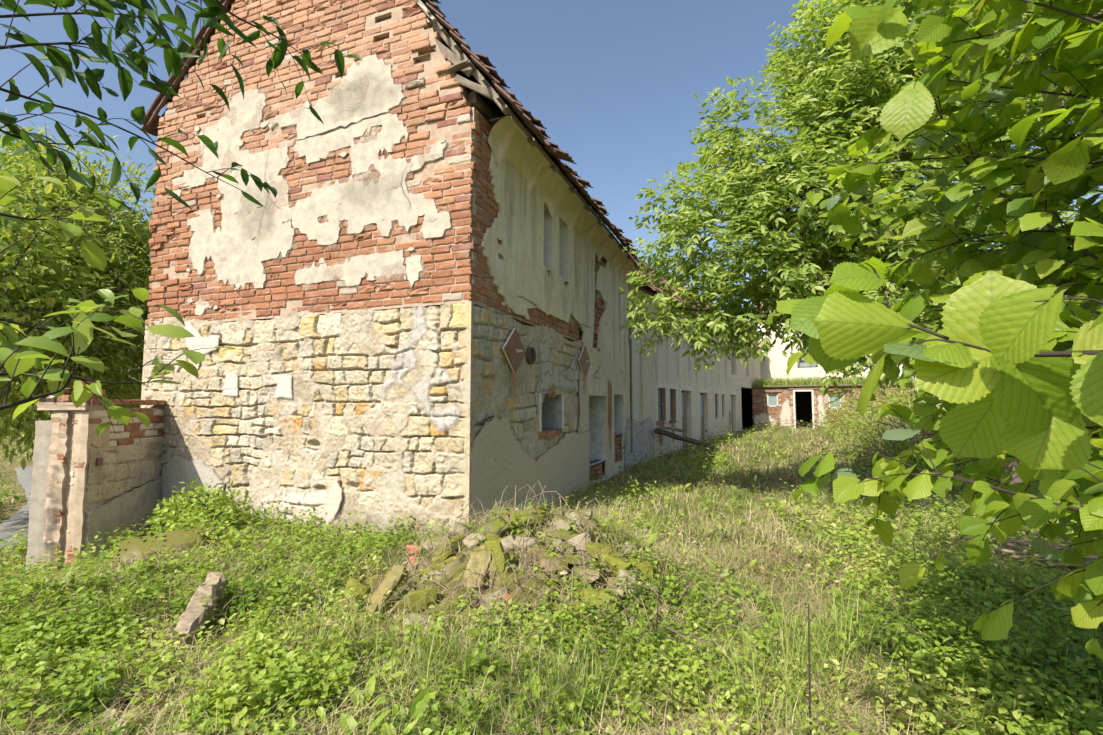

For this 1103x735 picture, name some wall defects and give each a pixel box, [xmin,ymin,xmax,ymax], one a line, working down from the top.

peeling [172,54,453,291]
peeling [184,295,219,369]
spalling [593,253,608,351]
peeling [222,372,238,396]
peeling [274,374,292,398]
peeling [312,479,342,531]